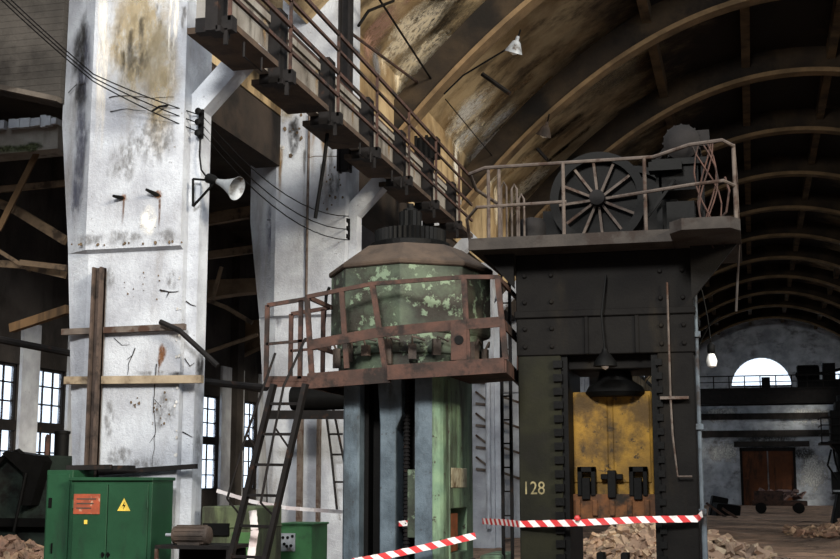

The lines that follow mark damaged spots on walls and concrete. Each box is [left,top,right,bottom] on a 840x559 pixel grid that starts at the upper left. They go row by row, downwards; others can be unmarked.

water stain [412,0,466,52]
water stain [72,0,185,210]
crack [150,364,161,466]